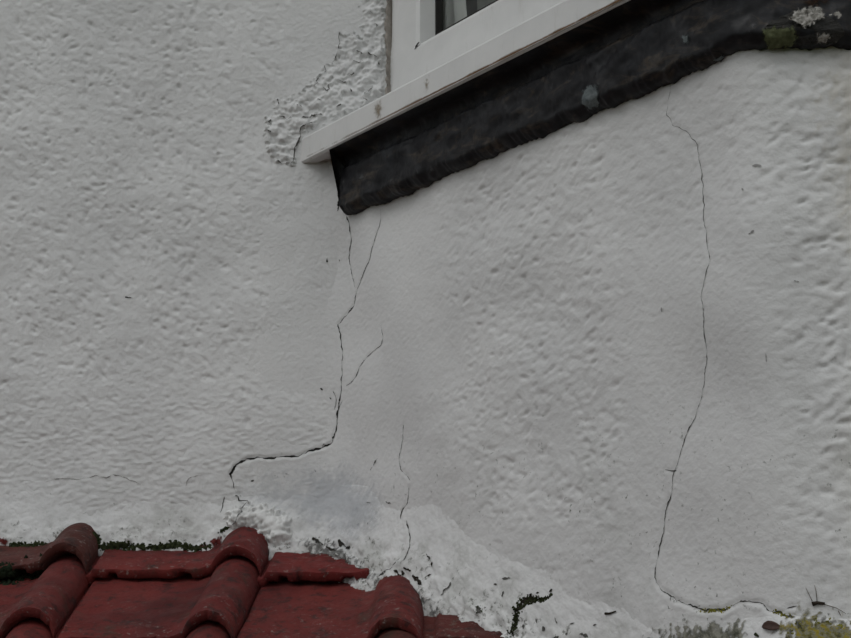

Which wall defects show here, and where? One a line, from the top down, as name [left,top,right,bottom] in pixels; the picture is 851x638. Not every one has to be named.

crack [277,122,312,164]
crack [220,193,383,525]
crack [376,440,411,577]
crack [654,85,796,619]